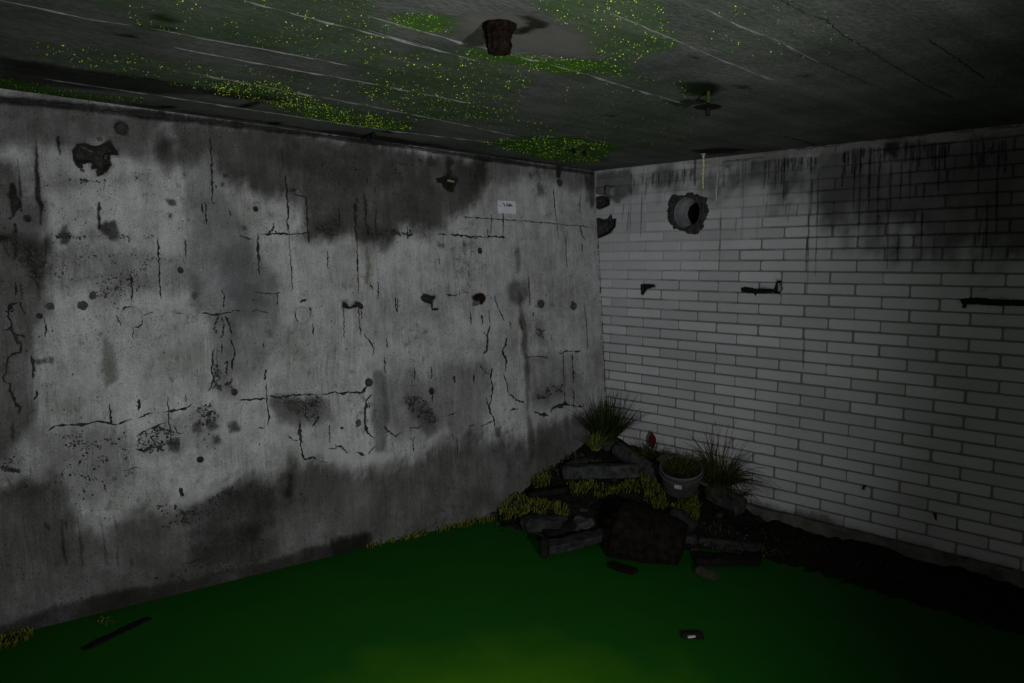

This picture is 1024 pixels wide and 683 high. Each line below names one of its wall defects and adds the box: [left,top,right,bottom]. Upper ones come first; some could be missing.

spalling [69,137,119,184]
damp [0,60,630,246]
spalling [436,176,457,192]
spalling [596,196,616,239]
damp [743,133,1024,252]
crack [3,276,47,414]
crack [50,138,606,471]
spalling [421,293,438,311]
spalling [472,293,486,306]
damp [0,416,616,637]